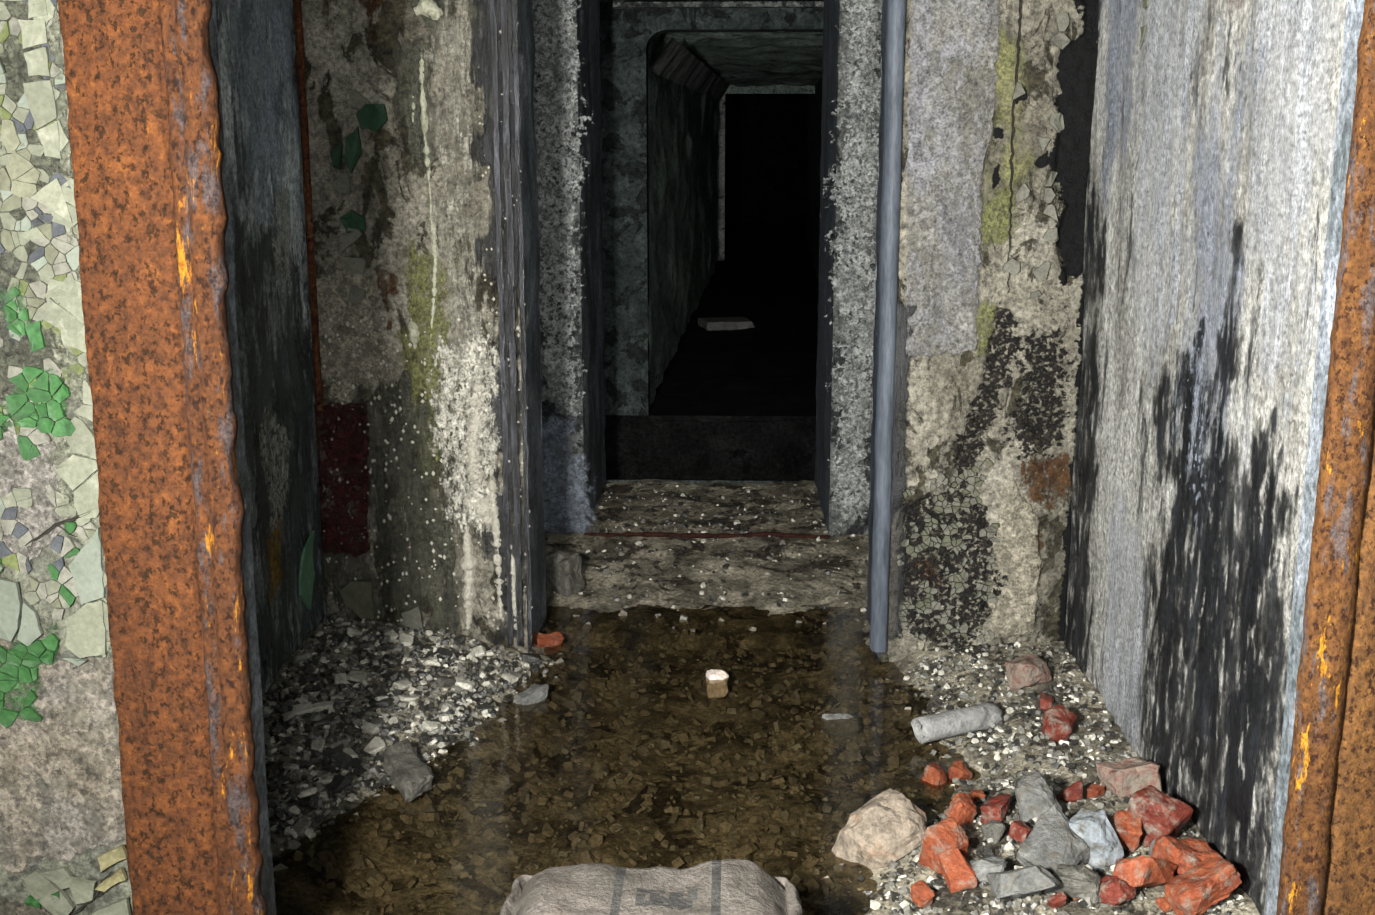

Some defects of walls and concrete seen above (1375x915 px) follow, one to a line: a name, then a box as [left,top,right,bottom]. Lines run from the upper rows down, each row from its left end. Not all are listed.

spalling [0,0,131,915]
leakage [1056,0,1158,674]
leakage [1182,0,1196,123]
leakage [1129,85,1298,915]